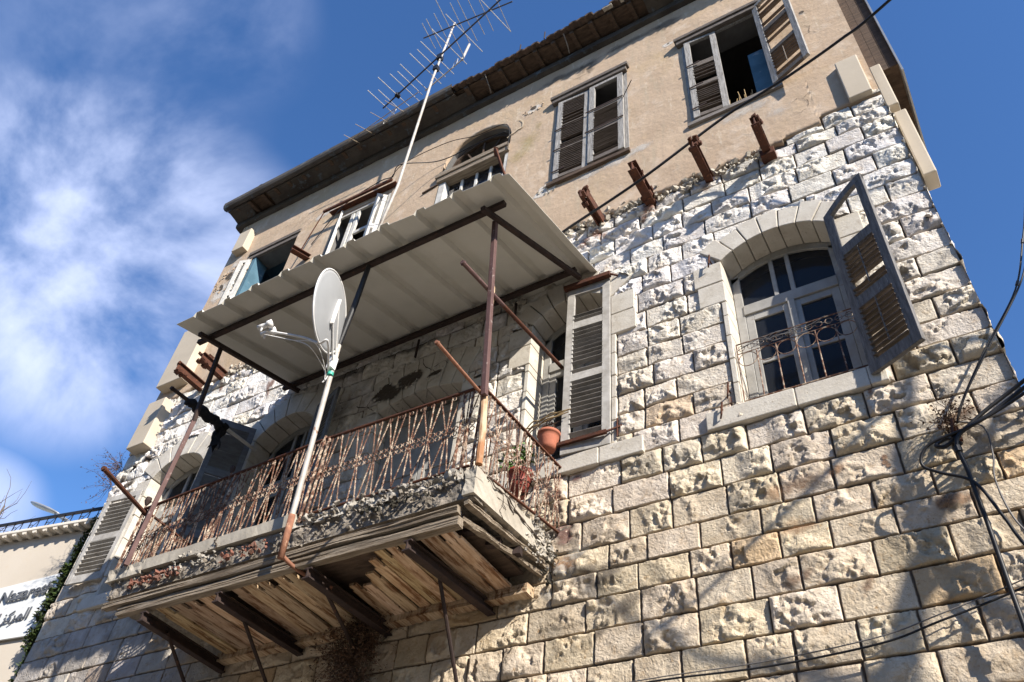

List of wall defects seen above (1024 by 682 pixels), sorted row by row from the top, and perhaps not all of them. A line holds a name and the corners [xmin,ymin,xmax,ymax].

spalling [564,144,762,241]
flaking render [211,259,248,302]
spalling [105,465,587,599]